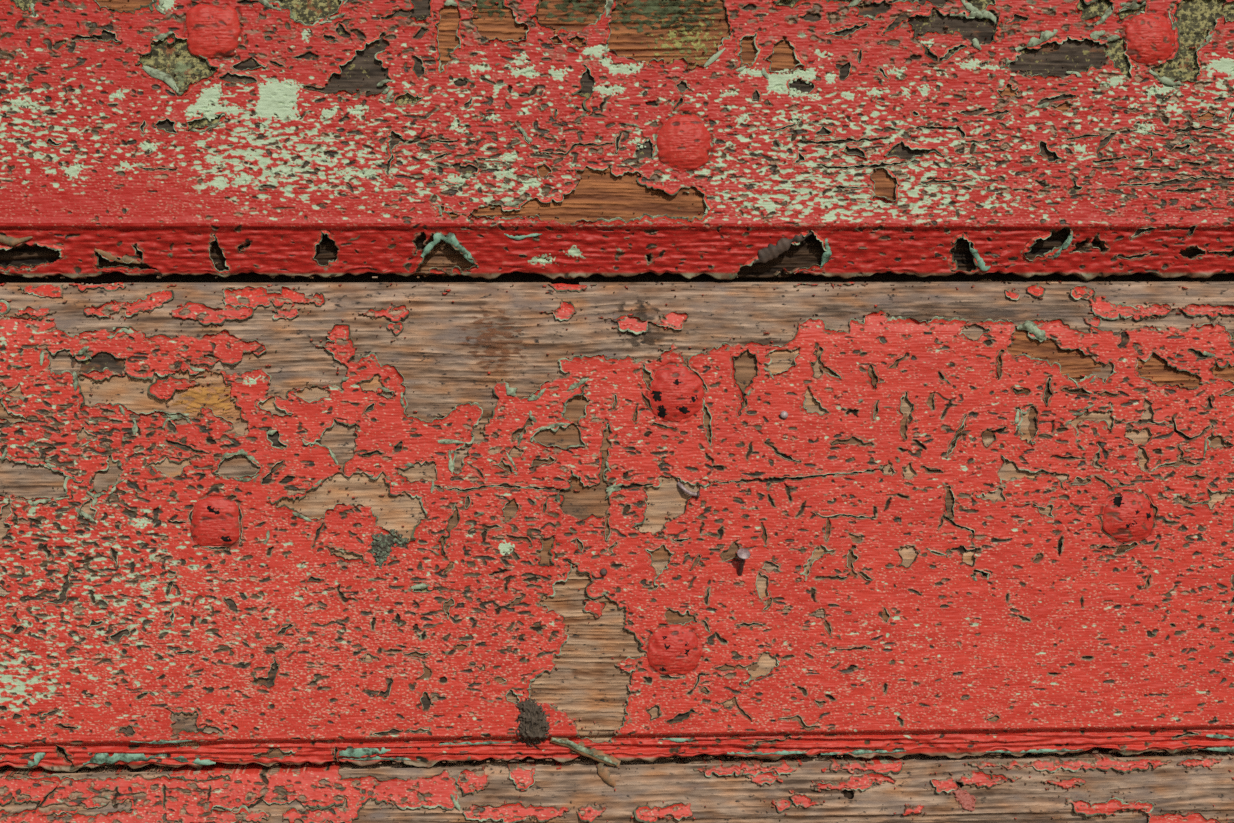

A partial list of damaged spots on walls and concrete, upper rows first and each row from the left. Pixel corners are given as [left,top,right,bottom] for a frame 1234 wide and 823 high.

peeling [120,31,240,171]
peeling [254,0,886,134]
peeling [769,0,1234,134]
peeling [0,127,1234,546]
crack [611,340,1234,589]
crack [111,788,119,808]
peeling [0,709,232,783]
crack [245,774,268,808]
crack [489,569,543,632]
peeling [164,536,1234,823]
crack [644,523,835,745]
crack [1172,731,1200,739]